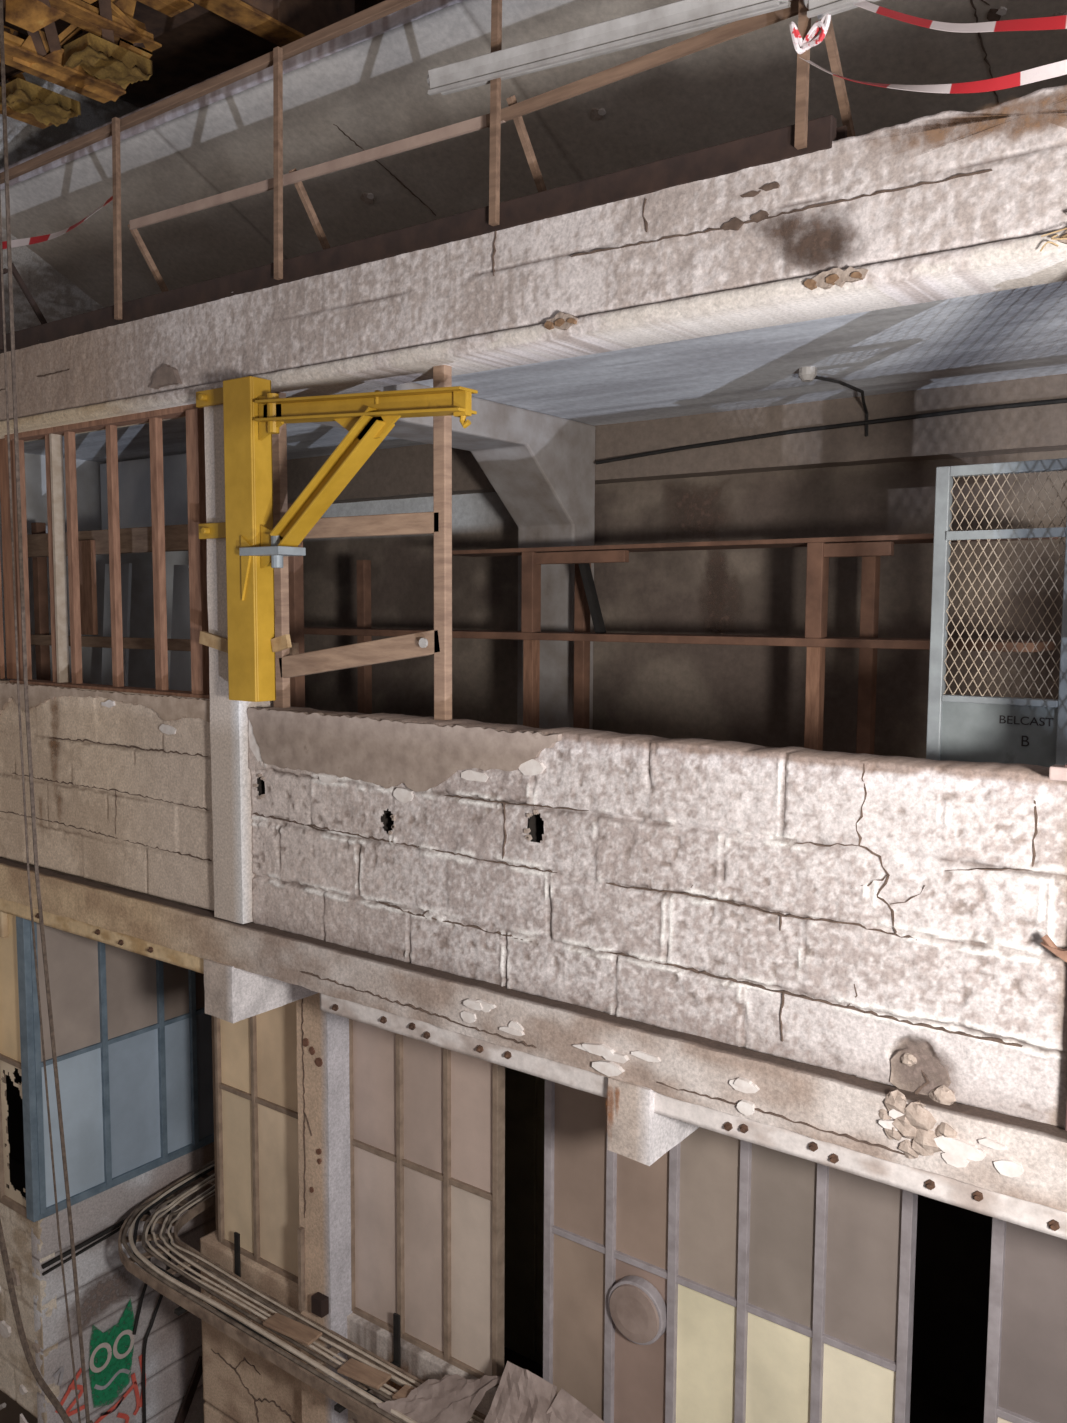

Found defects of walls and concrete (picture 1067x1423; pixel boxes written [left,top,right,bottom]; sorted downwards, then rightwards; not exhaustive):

crack [490,231,498,276]
crack [570,169,992,257]
leakage [768,213,854,266]
spalling [1040,213,1067,252]
crack [606,764,1038,941]
peeling [461,998,496,1023]
peeling [499,1020,525,1036]
peeling [573,1042,661,1077]
peeling [729,1077,760,1116]
spalling [878,1043,1024,1178]
crack [211,1349,295,1423]